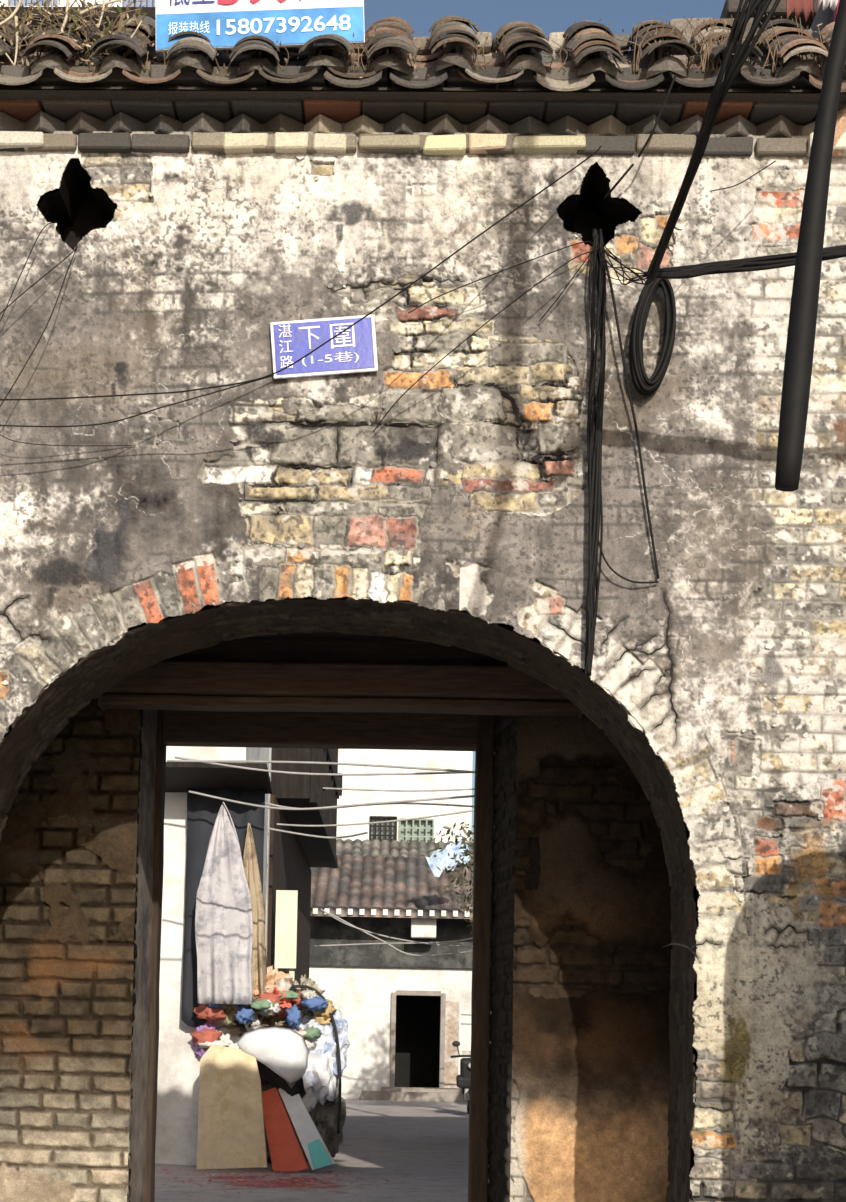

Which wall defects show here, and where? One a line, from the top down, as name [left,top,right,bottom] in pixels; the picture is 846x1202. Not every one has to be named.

water stain [336,202,362,244]
water stain [112,362,128,395]
water stain [242,418,283,460]
spalling [198,274,595,558]
peeling [718,157,846,981]
crack [0,597,49,641]
crack [549,596,678,747]
water stain [721,1012,750,1083]